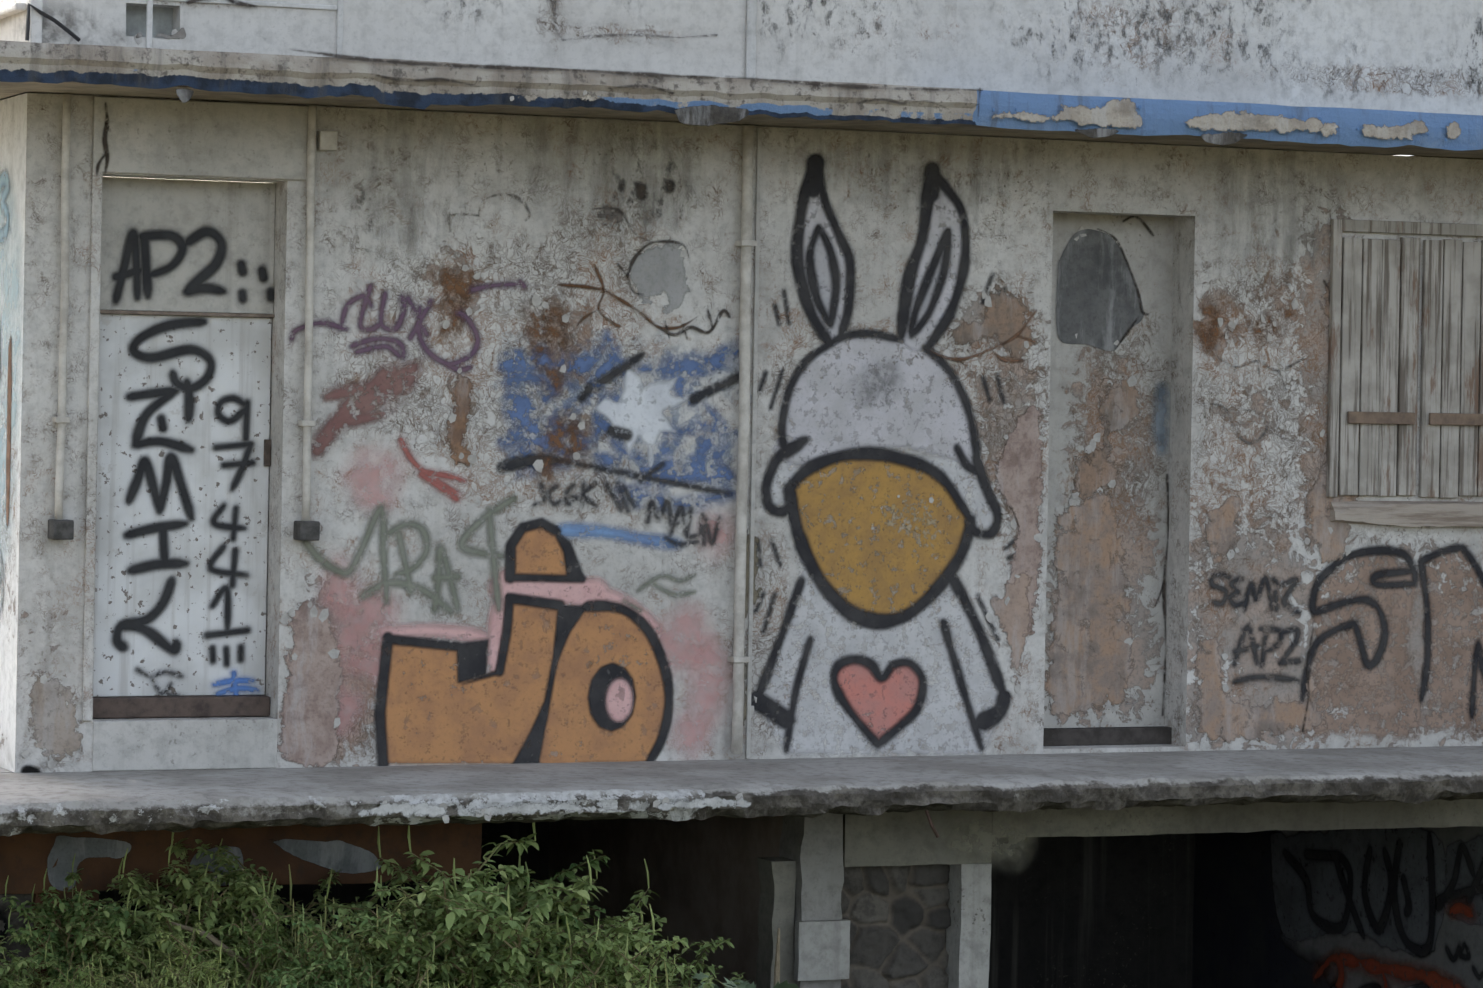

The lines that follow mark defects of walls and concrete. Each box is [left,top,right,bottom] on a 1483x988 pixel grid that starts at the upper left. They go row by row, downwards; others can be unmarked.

water stain [1151,5,1189,54]
peeling [991,98,1143,138]
peeling [1185,110,1339,146]
peeling [1357,119,1461,141]
flaking render [1056,226,1144,351]
peeling [943,284,1035,363]
peeling [1303,414,1359,564]
peeling [1203,496,1247,564]
peeling [1191,637,1322,744]
peeling [358,800,449,823]
peeling [471,801,618,821]
peeling [653,793,751,811]